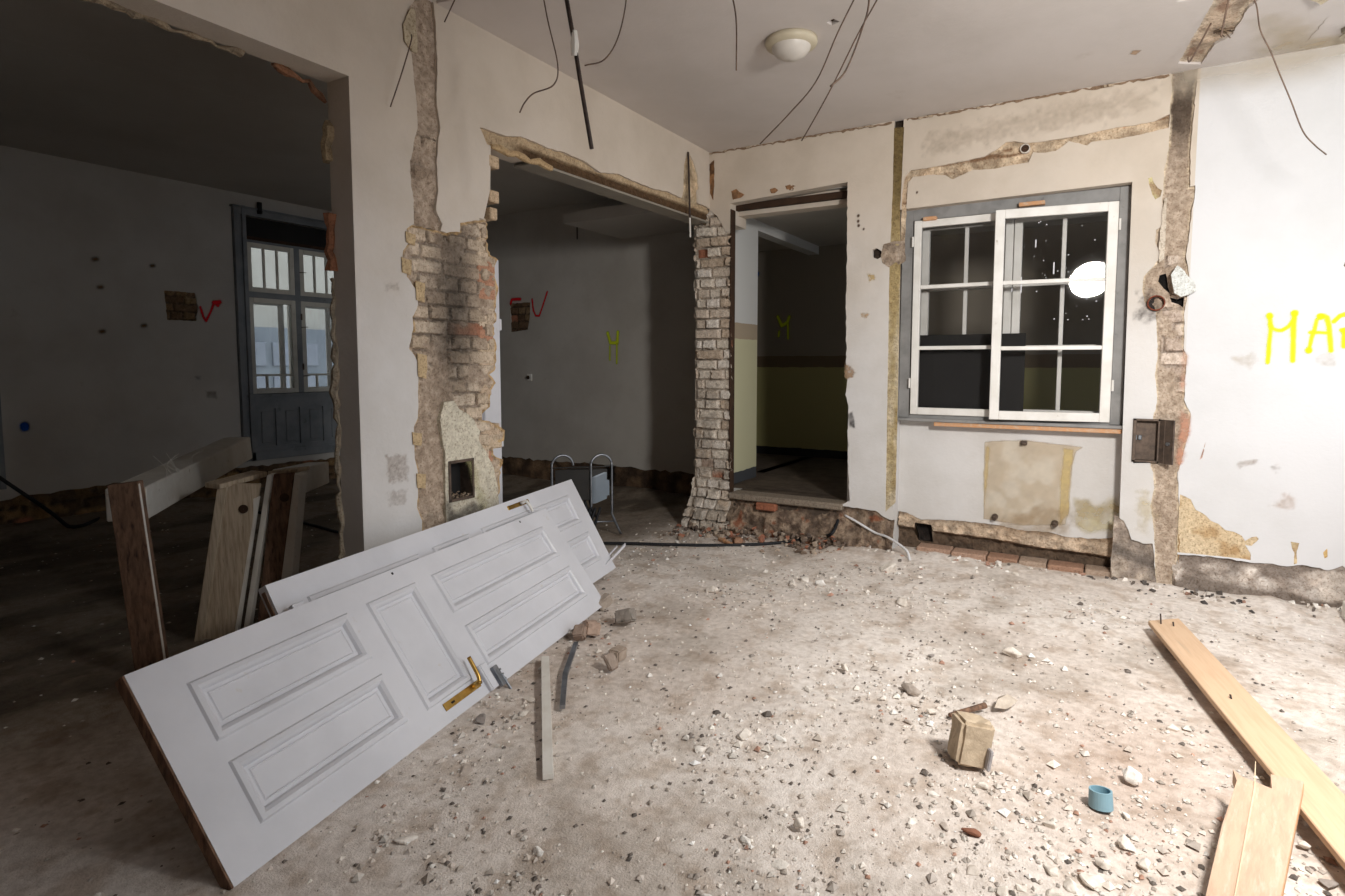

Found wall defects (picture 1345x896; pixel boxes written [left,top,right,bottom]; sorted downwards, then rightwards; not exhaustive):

flaking render [402,8,418,53]
spalling [481,129,714,226]
spalling [1148,177,1162,199]
spalling [1158,274,1183,307]
flaking render [401,190,695,531]
flaking render [721,440,1156,583]
flaking render [1172,495,1345,607]